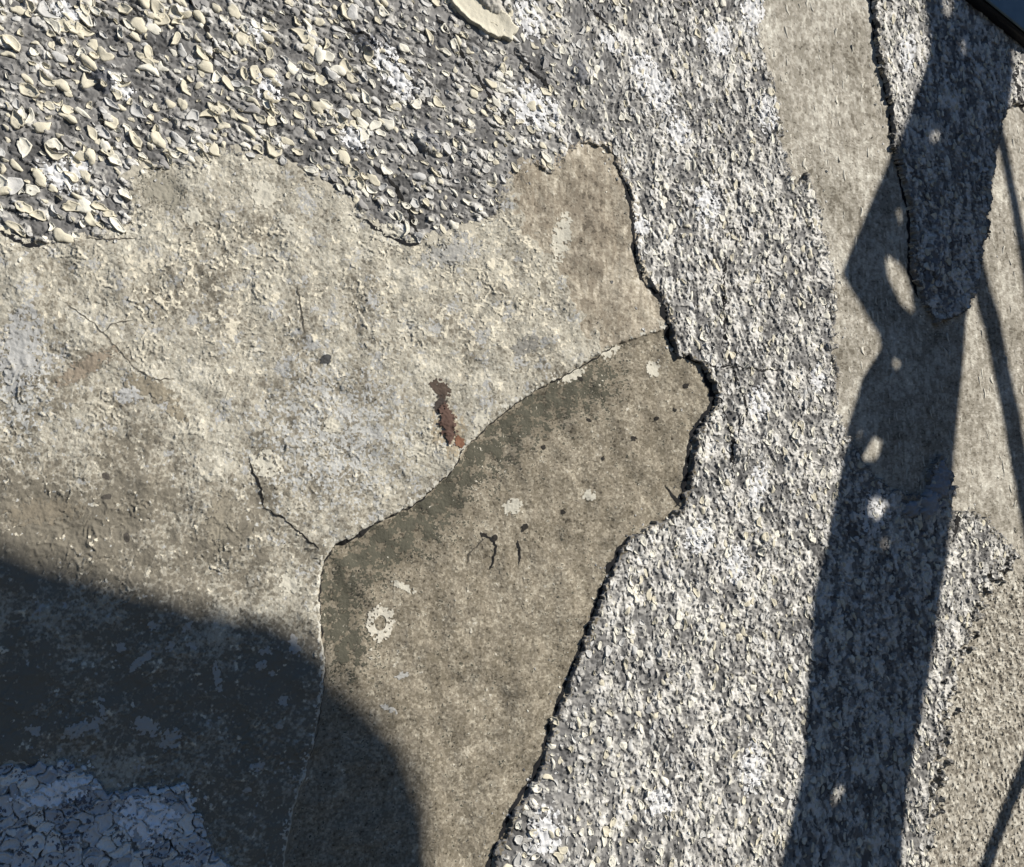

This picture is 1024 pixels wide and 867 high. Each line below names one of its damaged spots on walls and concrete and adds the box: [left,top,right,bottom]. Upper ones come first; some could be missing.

peeling [0,25,23,59]
peeling [450,188,478,213]
peeling [794,239,823,275]
rust [430,402,468,459]
peeling [787,420,818,450]
crack [249,346,614,762]
peeling [0,567,151,671]
crack [486,536,629,867]
peeling [677,680,775,788]
peeling [0,702,270,867]
peeling [575,840,601,867]